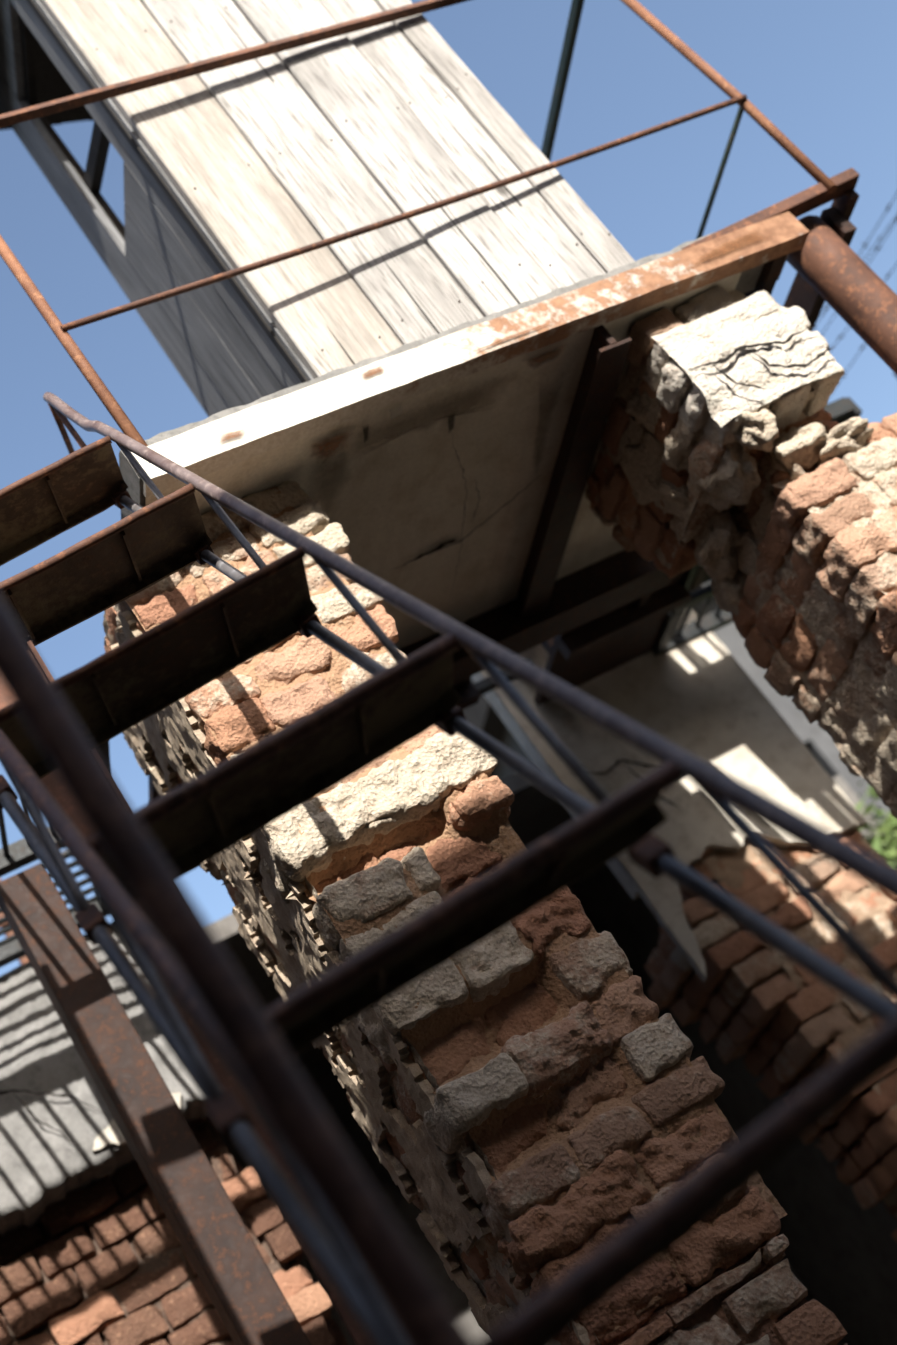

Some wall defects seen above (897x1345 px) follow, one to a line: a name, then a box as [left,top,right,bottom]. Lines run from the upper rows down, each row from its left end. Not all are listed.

corrosion [701,233,762,262]
corrosion [363,366,383,378]
crack [394,474,542,569]
crack [0,1089,111,1147]